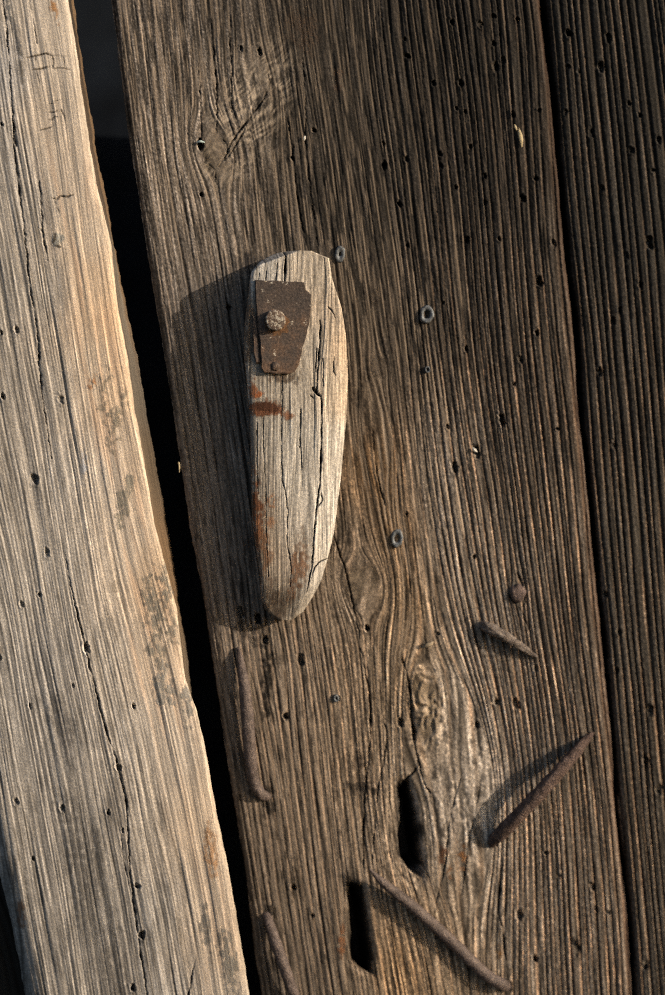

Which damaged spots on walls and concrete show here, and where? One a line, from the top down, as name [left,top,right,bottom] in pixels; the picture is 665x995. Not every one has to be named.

rust [249,384,293,420]
rust [252,472,274,570]
crack [256,328,361,652]
rust [287,543,308,601]